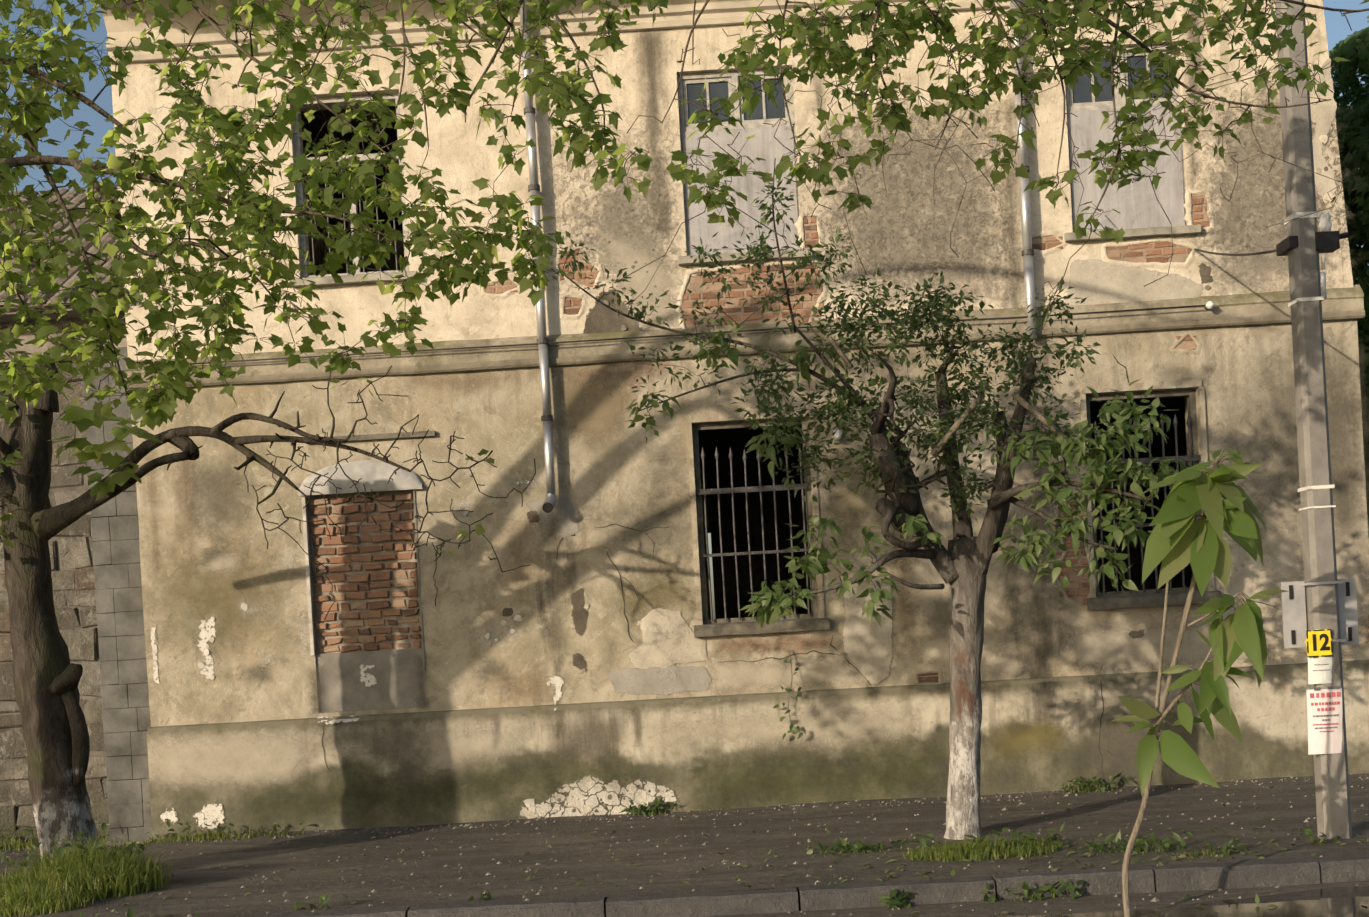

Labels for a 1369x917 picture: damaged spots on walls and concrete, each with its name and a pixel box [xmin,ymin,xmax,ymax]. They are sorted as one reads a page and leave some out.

damp [640,33,667,231]
flaking render [1183,92,1289,290]
flaking render [571,588,589,636]
peeling [150,627,160,684]
peeling [196,617,216,680]
flaking render [573,653,587,674]
crack [719,634,871,689]
peeling [547,676,564,711]